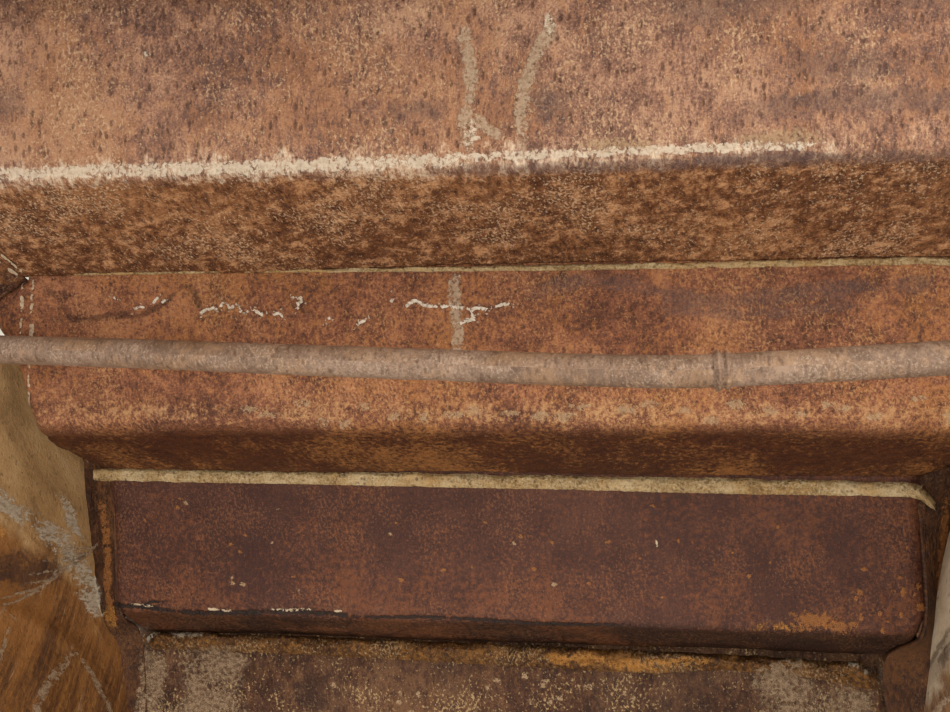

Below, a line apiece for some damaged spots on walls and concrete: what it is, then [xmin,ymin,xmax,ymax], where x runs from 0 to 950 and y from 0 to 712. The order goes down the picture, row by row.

rust [550,651,709,672]